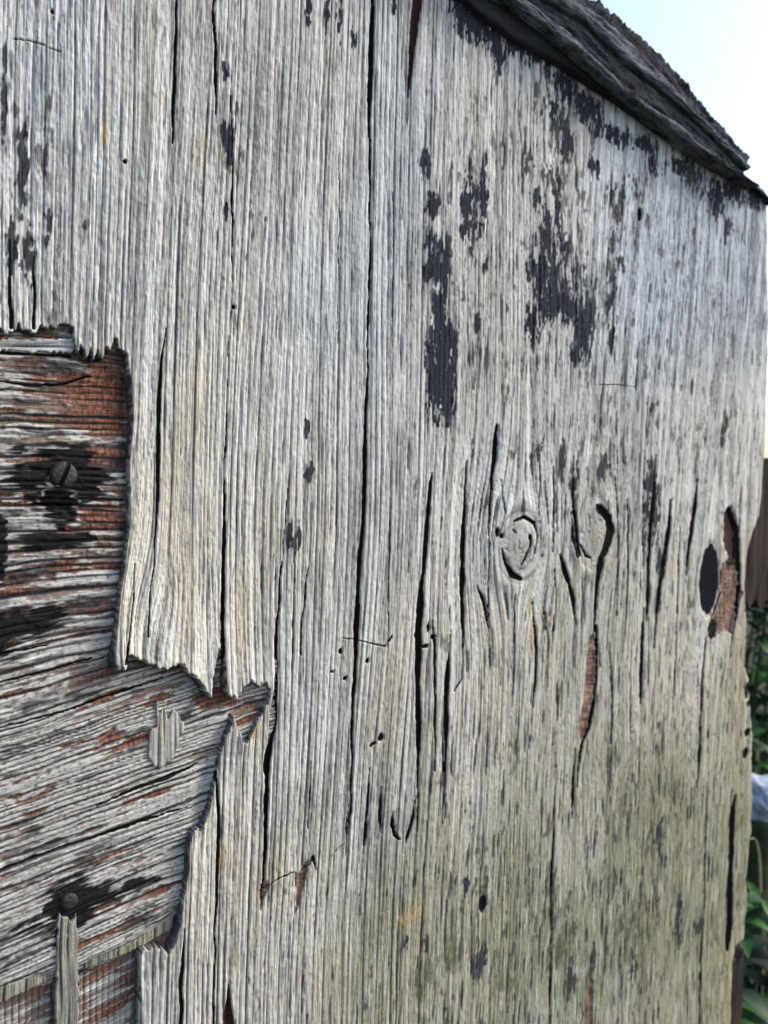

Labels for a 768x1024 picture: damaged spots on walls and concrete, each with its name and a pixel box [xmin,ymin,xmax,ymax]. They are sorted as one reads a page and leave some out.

crack [212,0,234,282]
peeling [420,147,490,428]
peeling [448,0,692,221]
peeling [524,177,617,368]
peeling [700,174,766,251]
peeling [0,325,277,1024]
crack [260,0,698,1024]
crack [696,507,741,783]
crack [698,794,736,1024]